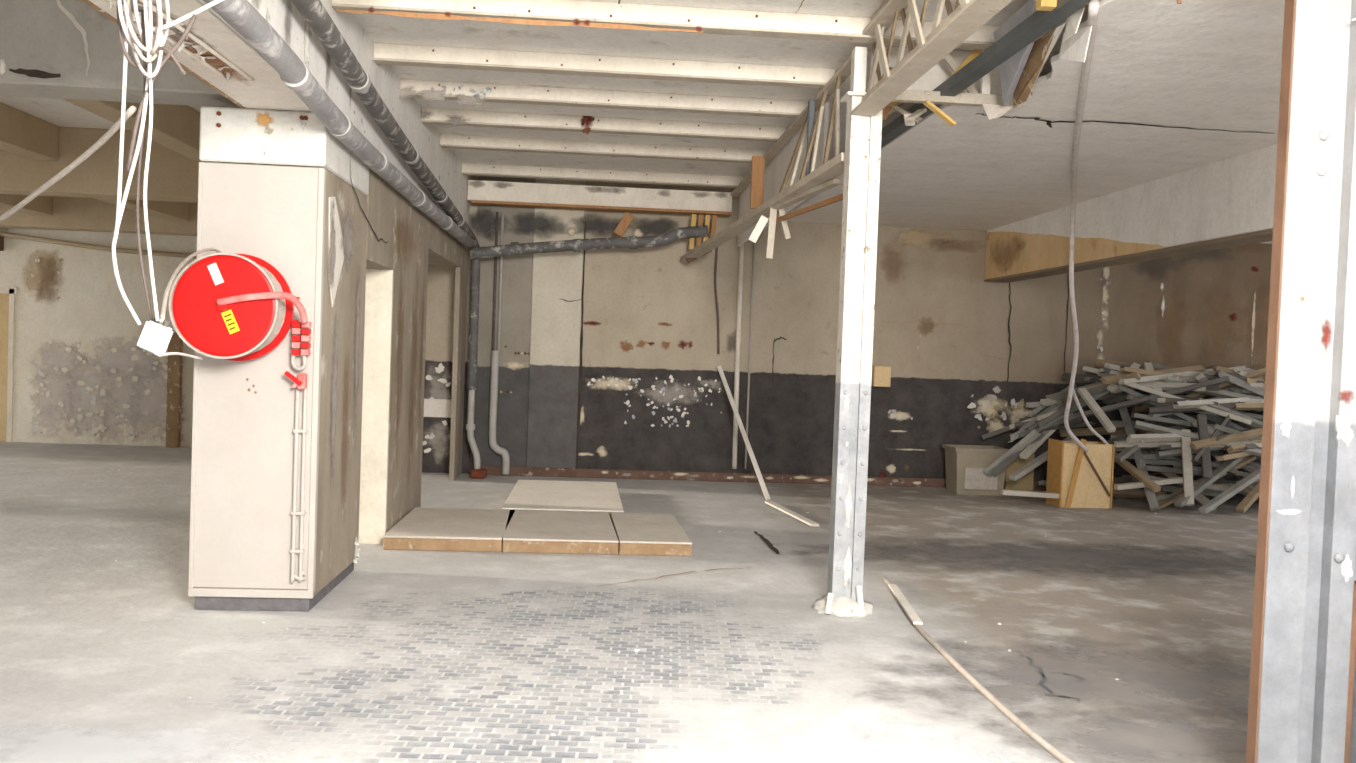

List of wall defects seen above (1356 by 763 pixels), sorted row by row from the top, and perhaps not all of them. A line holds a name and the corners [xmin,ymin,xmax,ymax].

crack [1005,282,1013,382]
peeling [33,338,182,444]
peeling [587,375,722,428]
spalling [579,446,632,476]